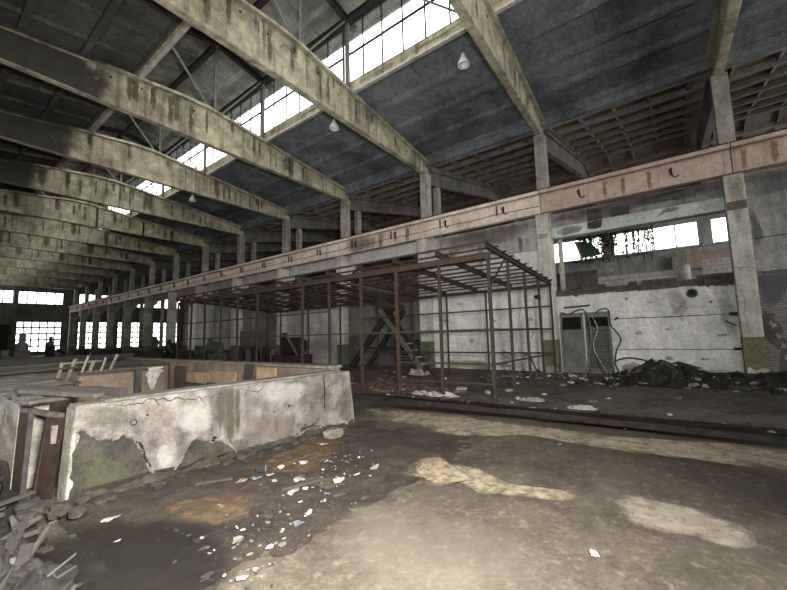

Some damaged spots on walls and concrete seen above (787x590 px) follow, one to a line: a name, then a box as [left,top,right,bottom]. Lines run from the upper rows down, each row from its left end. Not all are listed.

leakage [255,17,272,57]
leakage [127,78,139,101]
leakage [168,95,180,123]
leakage [252,136,304,179]
leakage [65,172,153,209]
leakage [62,203,86,234]
flaking render [747,308,787,374]
crack [107,393,219,406]
leakage [218,393,240,438]
crack [290,375,326,437]
flaking render [68,428,154,499]
flaking render [174,435,238,470]